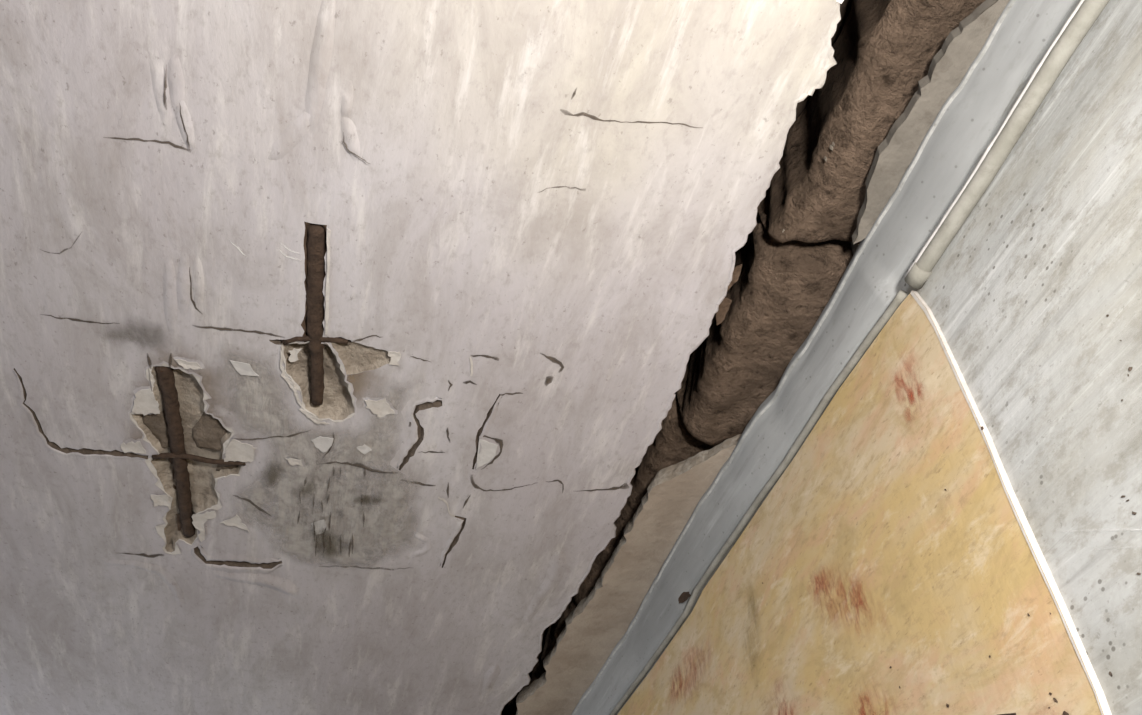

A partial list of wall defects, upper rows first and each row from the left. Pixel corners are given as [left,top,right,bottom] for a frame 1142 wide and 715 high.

crack [111,137,188,150]
crack [47,315,112,324]
crack [397,0,1010,715]
flaking render [121,221,413,564]
crack [12,368,148,460]
crack [123,551,161,559]
crack [191,545,283,574]